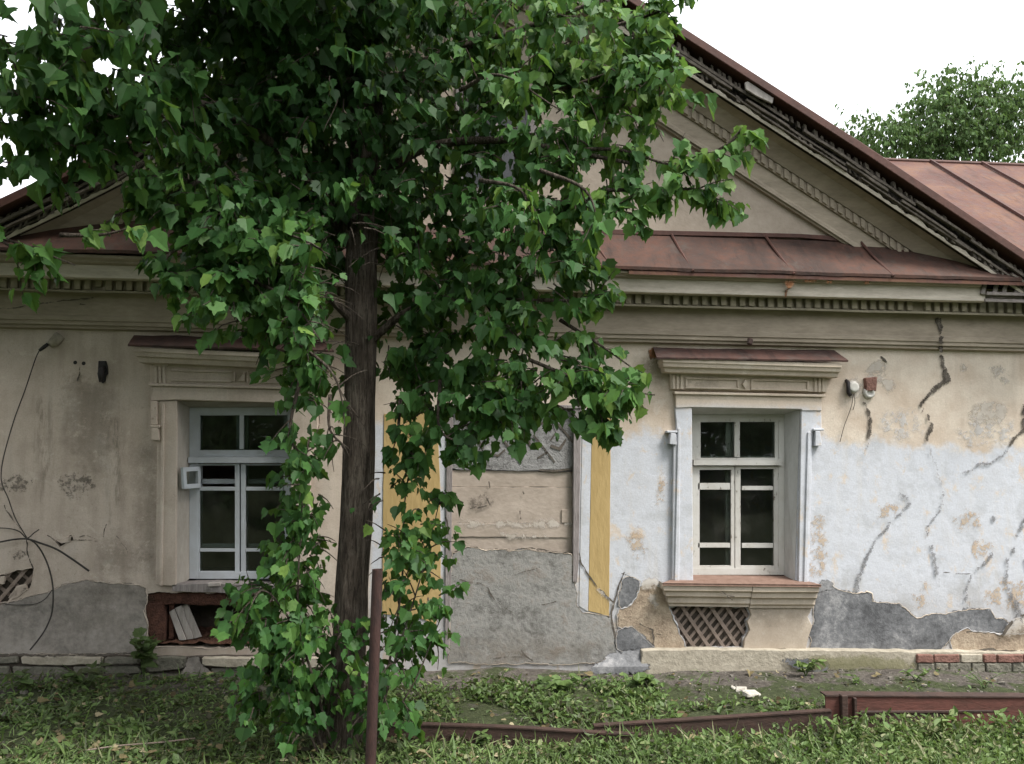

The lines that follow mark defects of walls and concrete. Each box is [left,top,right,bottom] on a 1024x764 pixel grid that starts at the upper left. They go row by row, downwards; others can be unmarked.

crack [863,402,872,449]
crack [919,318,1024,651]
crack [854,493,911,592]
spalling [0,567,36,605]
spalling [616,578,750,648]
peeling [986,581,1024,609]